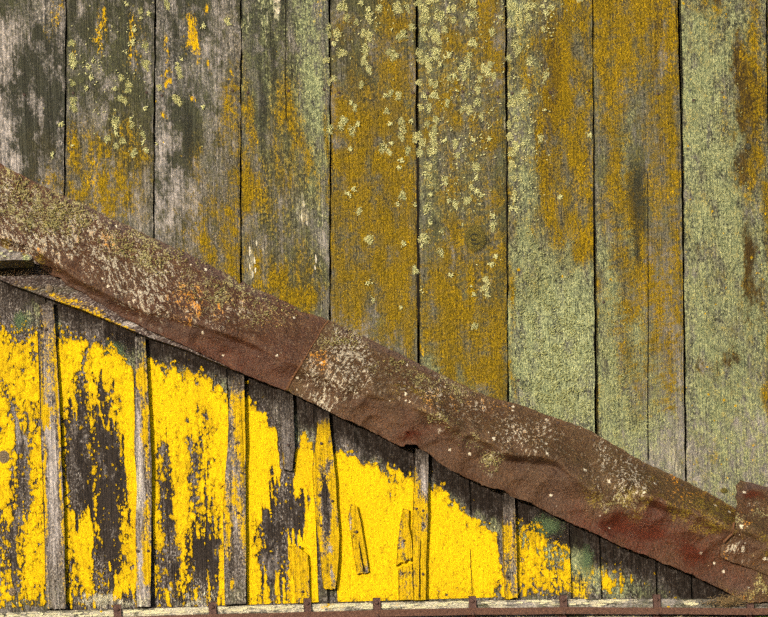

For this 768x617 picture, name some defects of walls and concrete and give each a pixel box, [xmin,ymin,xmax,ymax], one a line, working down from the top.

peeling [0,608,186,617]